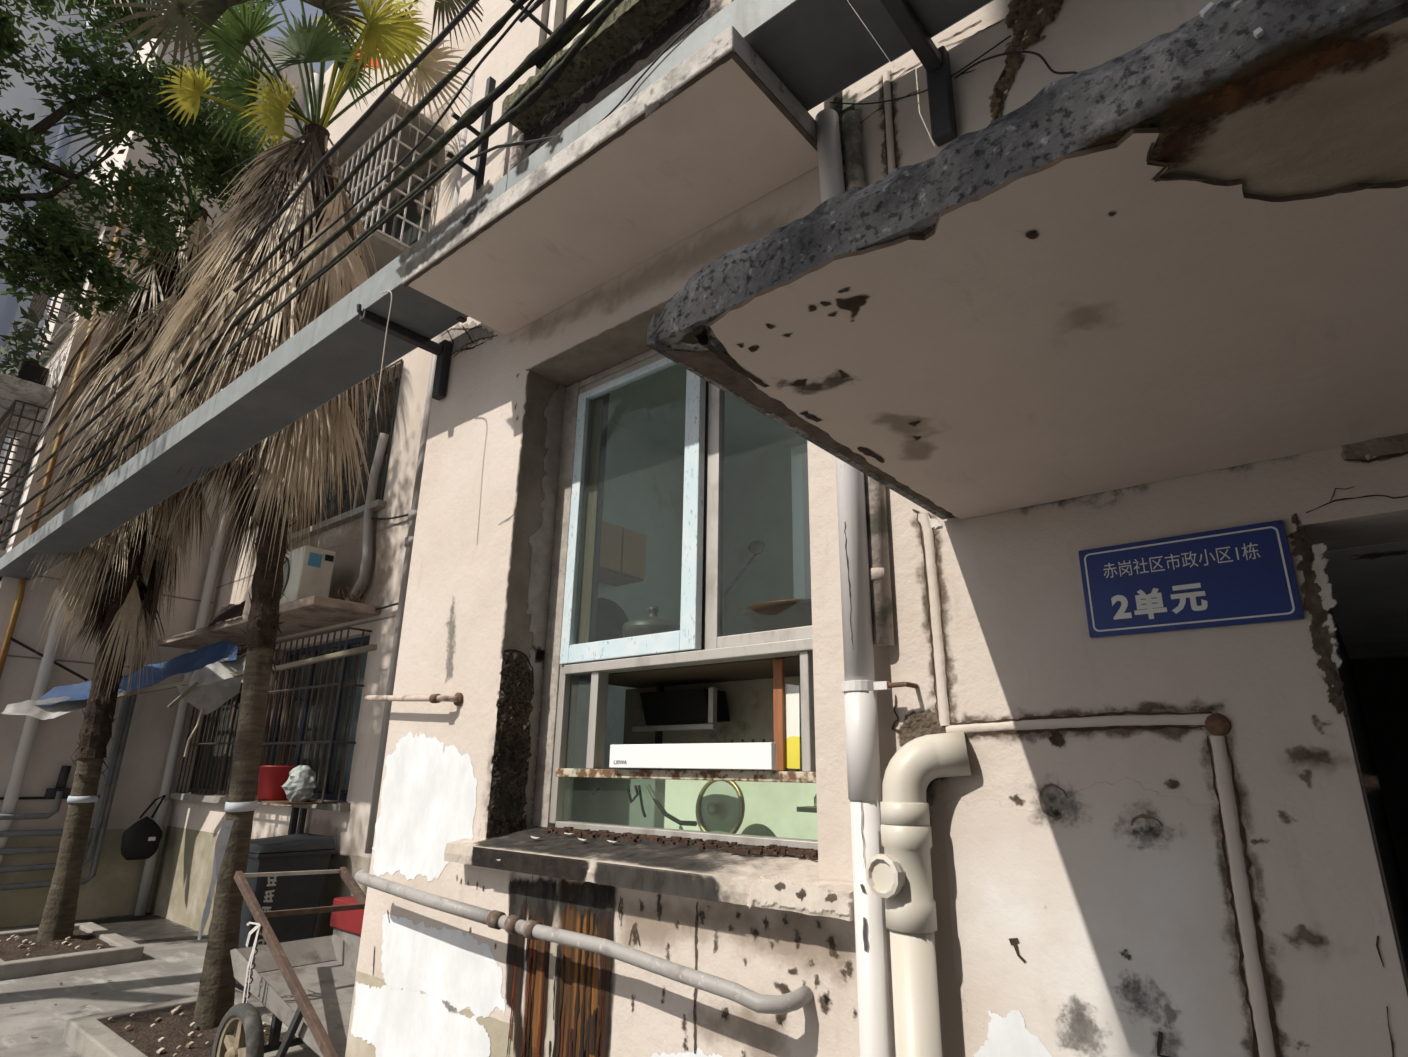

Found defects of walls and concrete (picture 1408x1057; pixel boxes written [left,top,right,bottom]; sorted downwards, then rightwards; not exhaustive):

spalling [938,0,1063,121]
flaking render [1081,0,1408,197]
peeling [809,288,869,322]
crack [1306,486,1408,513]
flaking render [1287,513,1408,992]
damp [618,894,678,946]
damp [694,902,740,970]
damp [751,918,801,948]
damp [817,921,852,977]
damp [774,960,831,1014]
damp [682,988,697,1054]